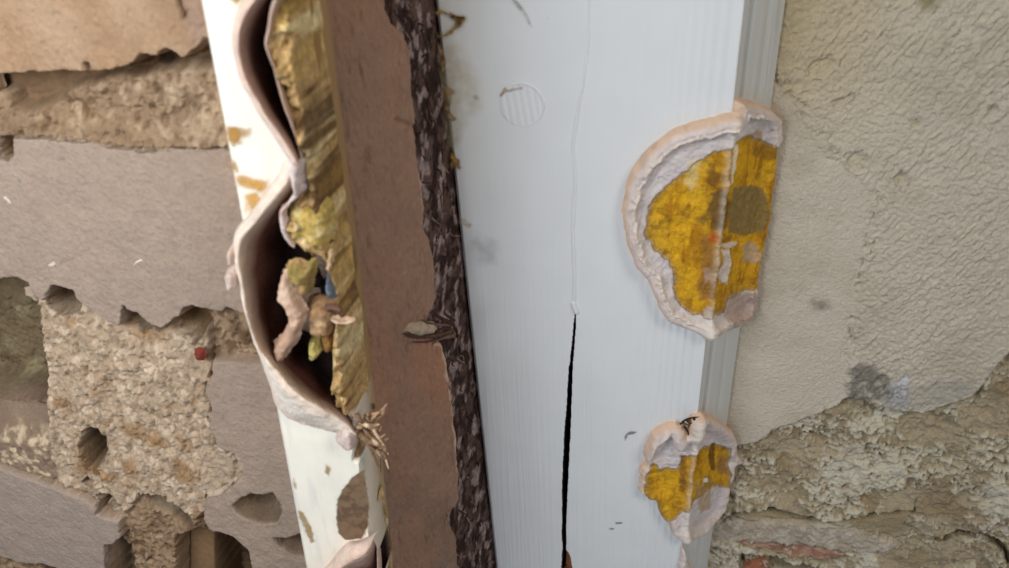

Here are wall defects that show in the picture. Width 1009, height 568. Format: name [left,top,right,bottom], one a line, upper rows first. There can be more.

spalling [120,305,214,361]
crack [561,314,576,568]
spalling [707,352,1009,568]
hole [173,526,252,568]
peeling [299,511,314,543]